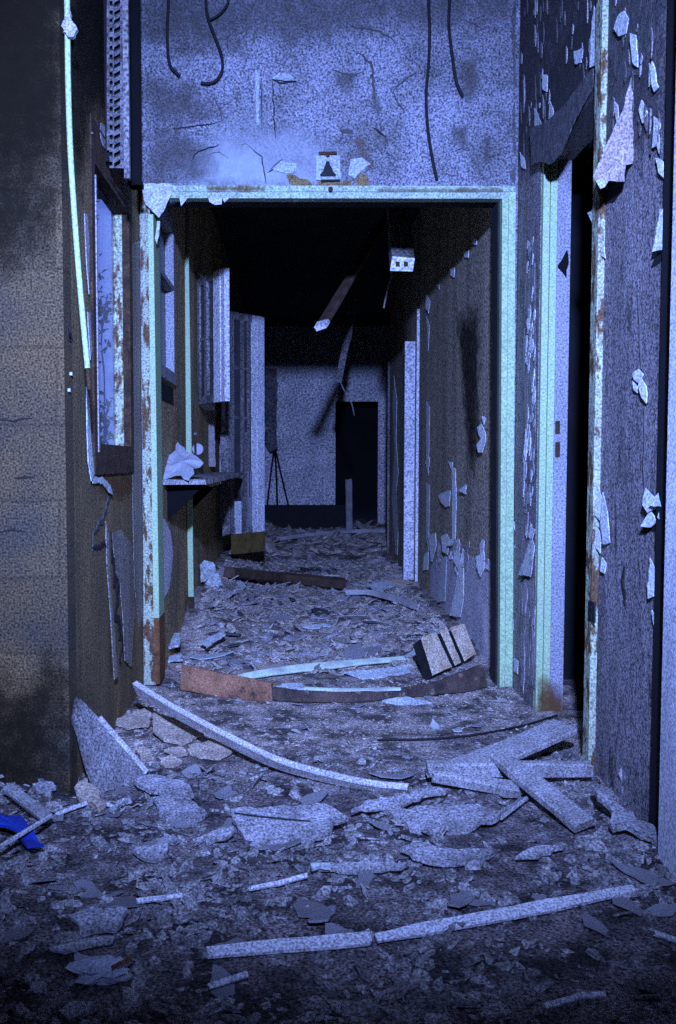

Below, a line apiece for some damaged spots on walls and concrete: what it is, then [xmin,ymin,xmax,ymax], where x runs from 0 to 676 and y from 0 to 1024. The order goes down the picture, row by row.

crack [143,95,283,182]
flaking render [208,149,370,186]
crack [326,1,420,170]
crack [439,148,486,176]
peeling [510,0,664,205]
peeling [425,284,440,349]
peeling [512,237,536,694]
peeling [423,401,491,667]
corrosion [539,682,562,711]